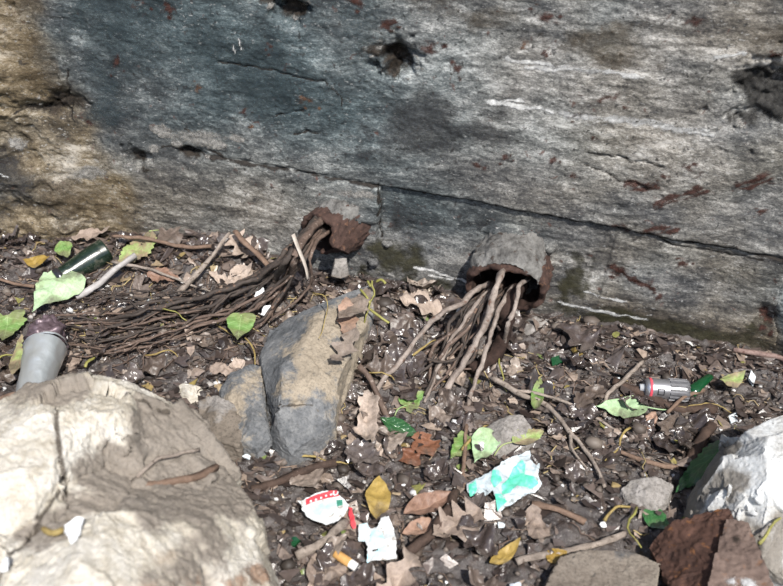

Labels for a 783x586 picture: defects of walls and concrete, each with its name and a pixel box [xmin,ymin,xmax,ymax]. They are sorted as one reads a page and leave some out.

spalling [260,0,309,20]
spalling [362,40,423,80]
spalling [718,57,783,130]
crack [161,128,783,263]
rust [623,174,710,210]
rust [735,173,774,190]
rust [608,264,662,299]